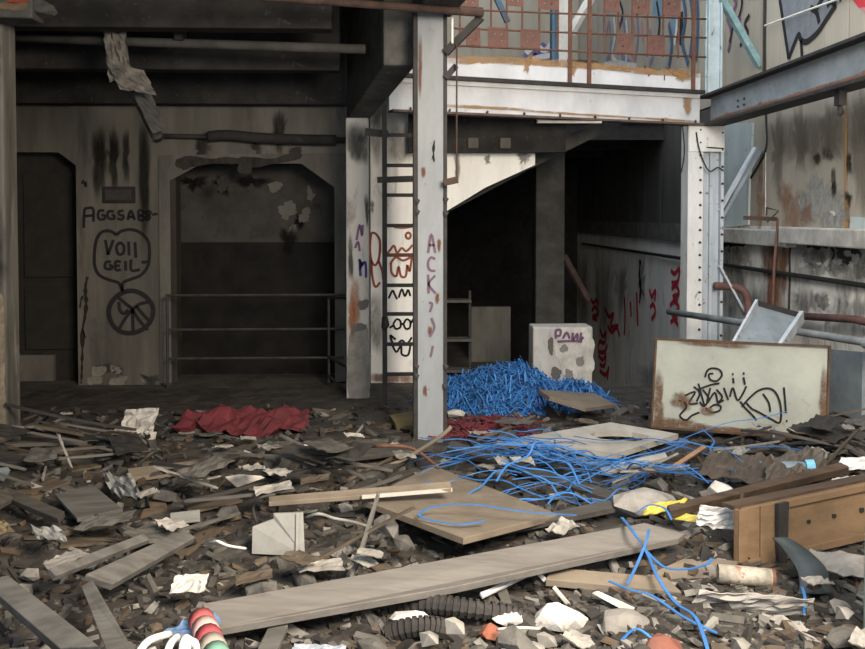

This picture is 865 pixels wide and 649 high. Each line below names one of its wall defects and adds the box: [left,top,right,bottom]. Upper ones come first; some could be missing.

corrosion [458,56,691,81]
water stain [93,134,129,189]
water stain [140,132,149,227]
water stain [773,110,865,228]